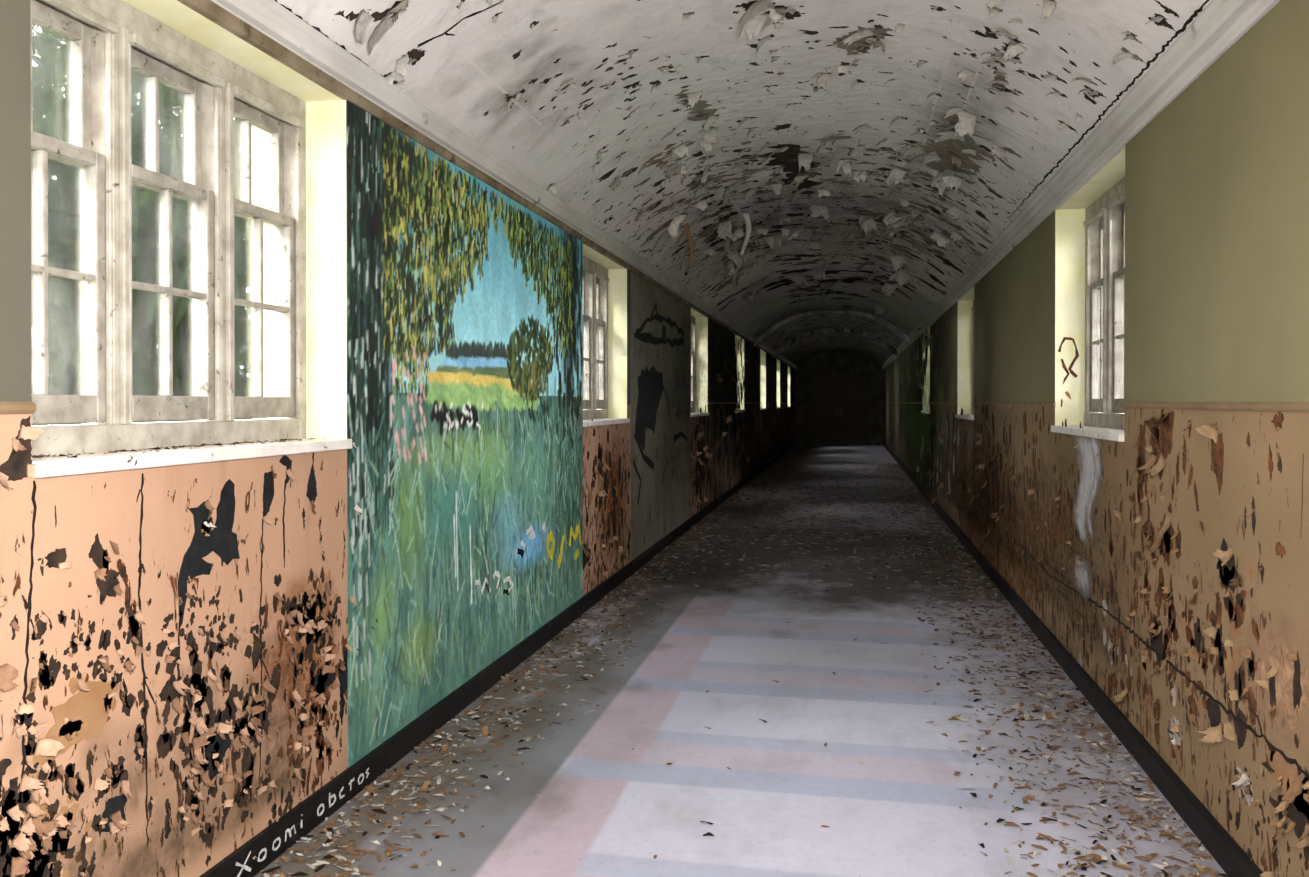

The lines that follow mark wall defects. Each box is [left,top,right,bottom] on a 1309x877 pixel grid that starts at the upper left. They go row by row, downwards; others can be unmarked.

peeling [335,0,410,54]
peeling [384,48,426,94]
peeling [505,0,1179,315]
peeling [0,416,47,490]
peeling [263,455,317,528]
peeling [583,419,634,580]
water stain [1075,436,1100,538]
peeling [911,326,1302,771]
peeling [0,479,360,877]
peeling [1218,742,1309,877]